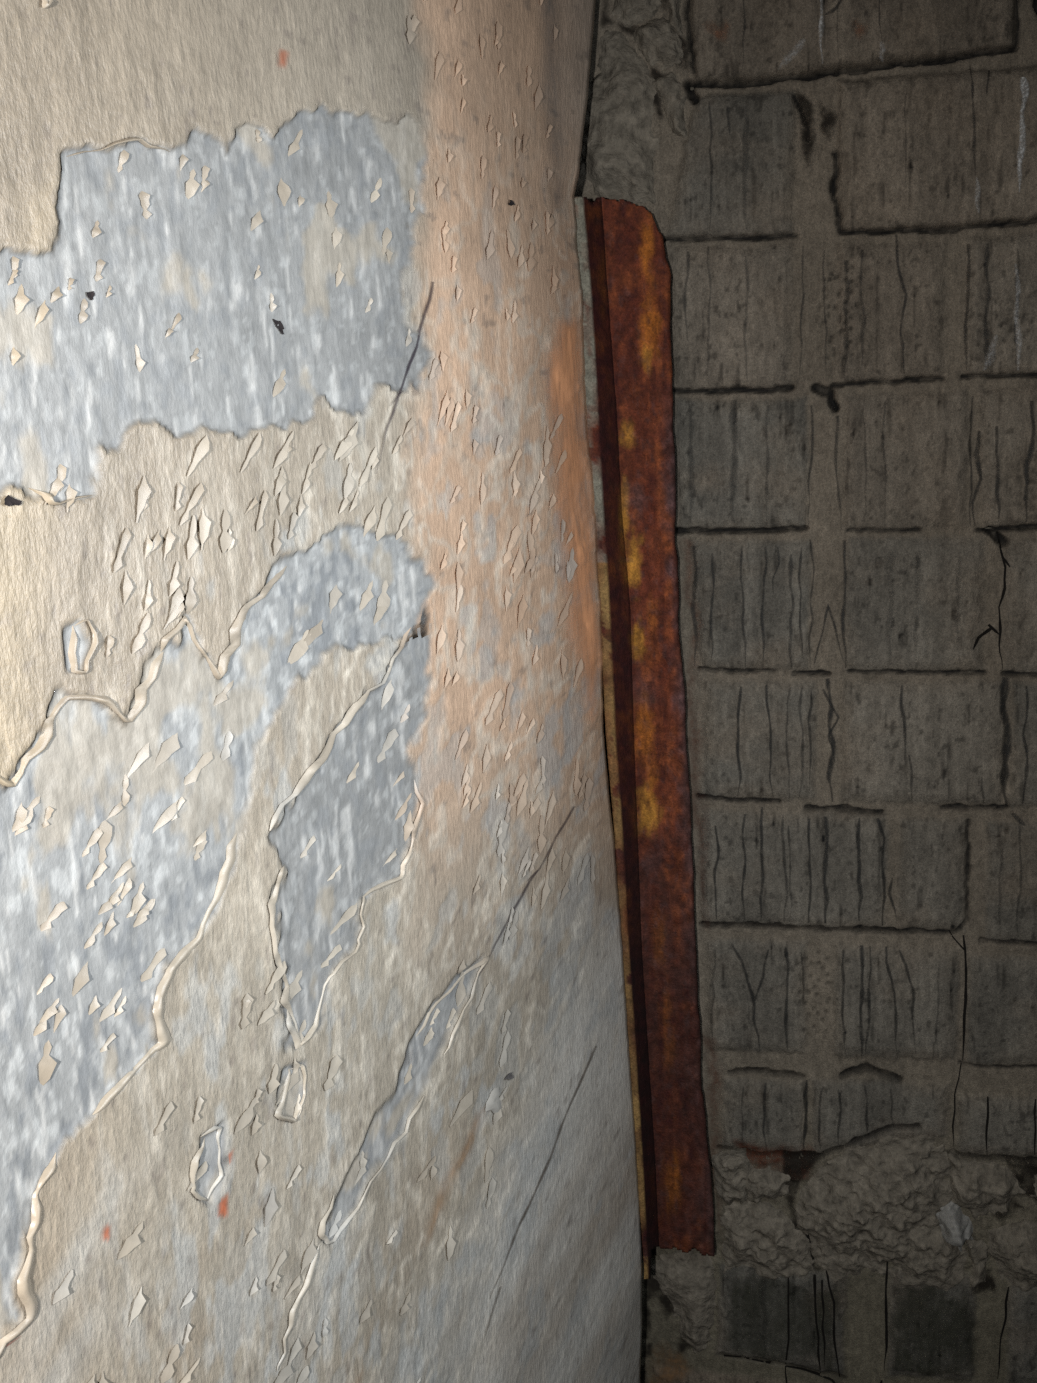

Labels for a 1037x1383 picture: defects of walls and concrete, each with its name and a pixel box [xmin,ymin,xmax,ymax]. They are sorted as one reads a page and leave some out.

peeling [481,112,554,272]
peeling [437,389,479,455]
peeling [495,414,577,665]
corrosion [551,327,598,682]
crack [973,531,1010,669]
peeling [0,105,467,1357]
peeling [455,682,596,945]
peeling [450,1009,514,1127]
spalling [783,1150,820,1229]
spalling [936,1201,974,1252]
spalling [995,1158,1037,1217]
peeling [161,1324,200,1383]